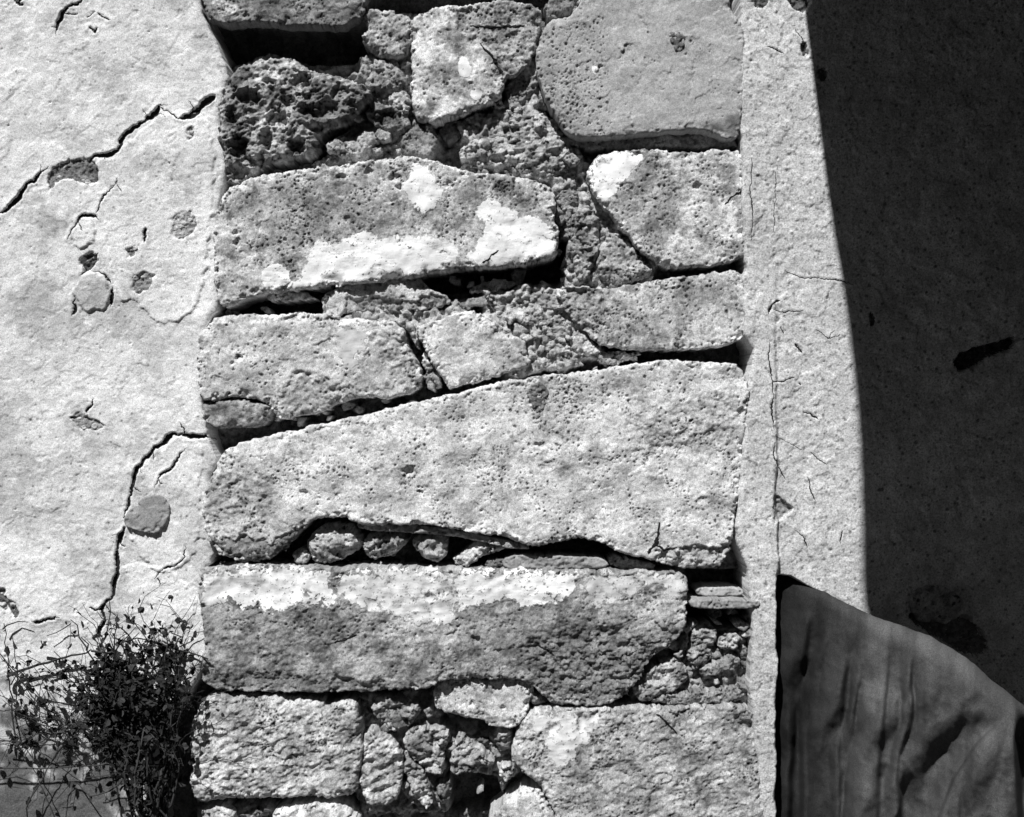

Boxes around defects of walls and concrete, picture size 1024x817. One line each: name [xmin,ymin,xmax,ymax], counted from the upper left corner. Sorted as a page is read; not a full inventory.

crack [0,165,48,213]
flaking render [47,158,99,188]
crack [67,95,216,239]
crack [71,253,114,316]
crack [89,424,217,646]